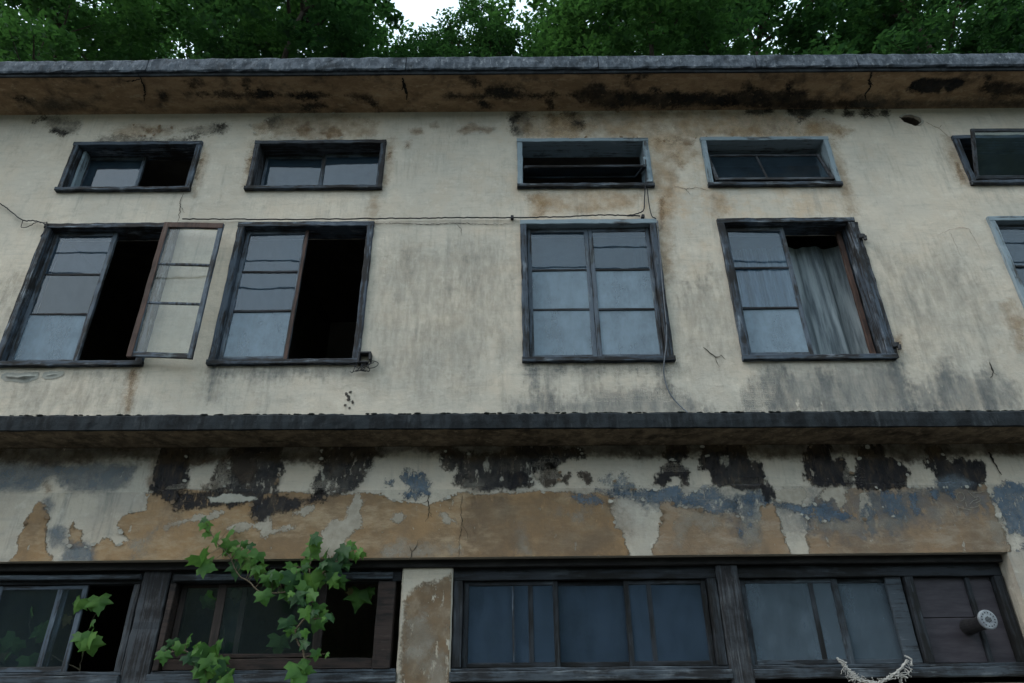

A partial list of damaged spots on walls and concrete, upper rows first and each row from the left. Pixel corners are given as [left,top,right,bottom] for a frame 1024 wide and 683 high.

damp [190,77,330,111]
damp [445,75,558,134]
damp [571,74,1024,130]
peeling [10,444,1024,561]
peeling [400,573,452,683]